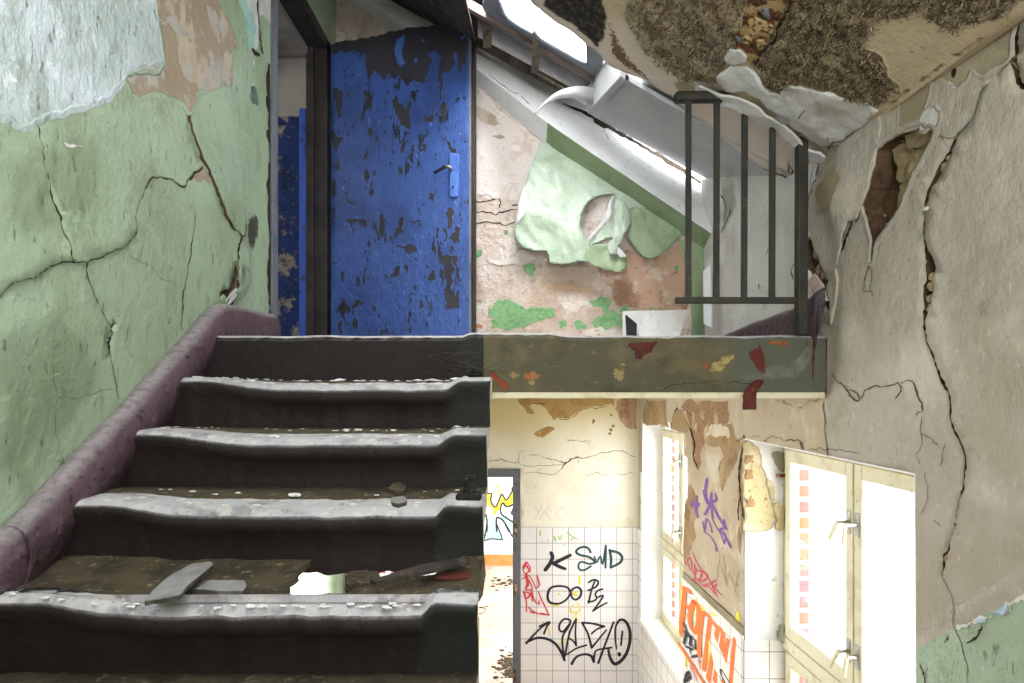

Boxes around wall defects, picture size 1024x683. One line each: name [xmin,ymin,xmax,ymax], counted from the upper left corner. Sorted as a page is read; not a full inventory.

crack [0,114,247,399]
peeling [0,0,271,133]
peeling [331,24,468,122]
peeling [392,94,411,128]
peeling [427,193,460,310]
peeling [476,86,688,331]
spalling [624,0,1023,294]
flaking render [808,238,839,326]
peeling [488,368,540,393]
crack [737,26,1024,682]
crack [489,440,636,476]
spalling [613,338,785,559]